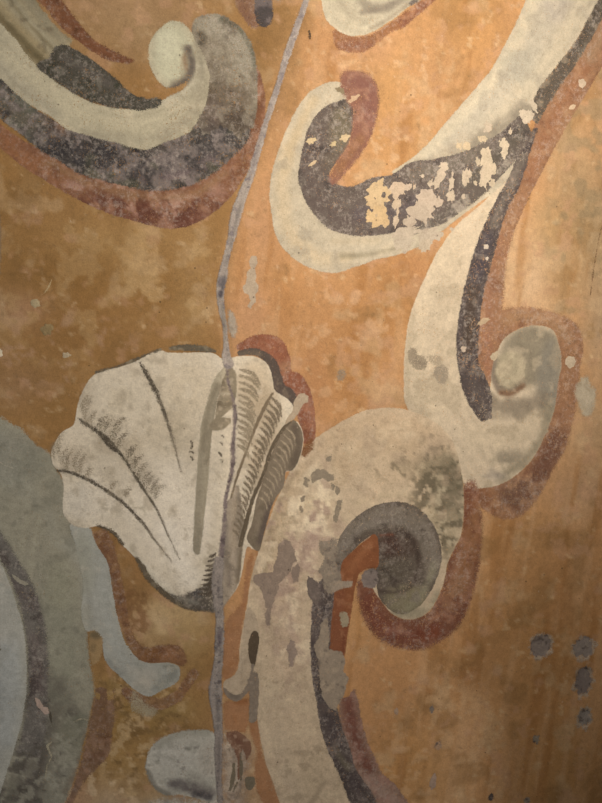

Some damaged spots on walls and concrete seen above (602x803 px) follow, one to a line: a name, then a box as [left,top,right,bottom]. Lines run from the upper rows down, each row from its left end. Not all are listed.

peeling [519,99,538,124]
peeling [364,120,513,254]
crack [208,0,311,803]